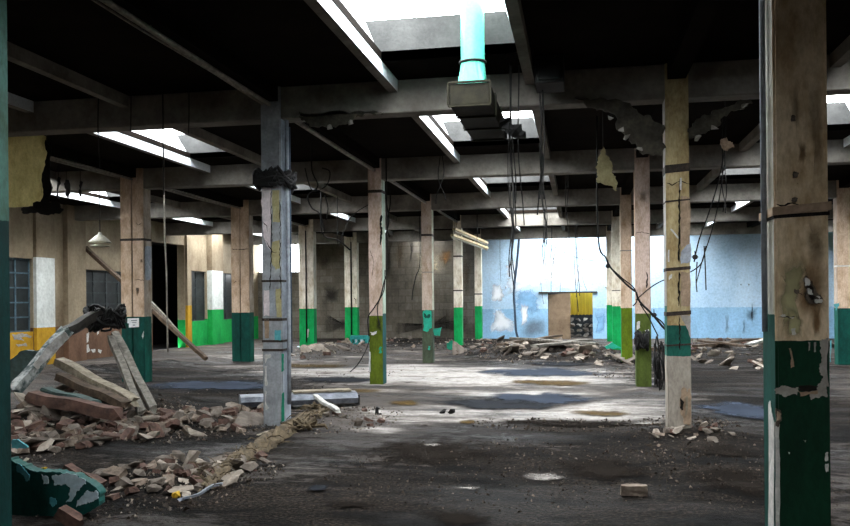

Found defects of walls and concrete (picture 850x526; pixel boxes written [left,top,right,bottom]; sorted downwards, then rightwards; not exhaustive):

spalling [299,110,384,130]
spalling [575,97,666,157]
spalling [687,99,753,141]
crack [668,180,688,306]
peeling [492,286,506,300]
spalling [794,276,823,305]
peeling [423,310,432,332]
peeling [492,312,512,330]
peeling [12,333,32,347]
peeling [768,338,832,526]